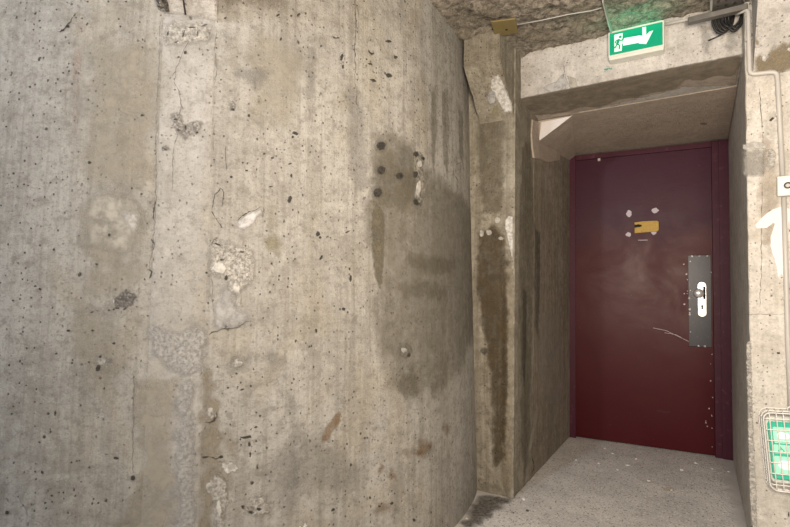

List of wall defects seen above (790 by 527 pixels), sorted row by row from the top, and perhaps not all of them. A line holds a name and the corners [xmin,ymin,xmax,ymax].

spalling [171,113,201,140]
spalling [413,152,426,203]
spalling [205,240,255,293]
damp [372,205,384,285]
spalling [112,292,136,310]
damp [477,227,514,490]
spalling [206,462,238,527]